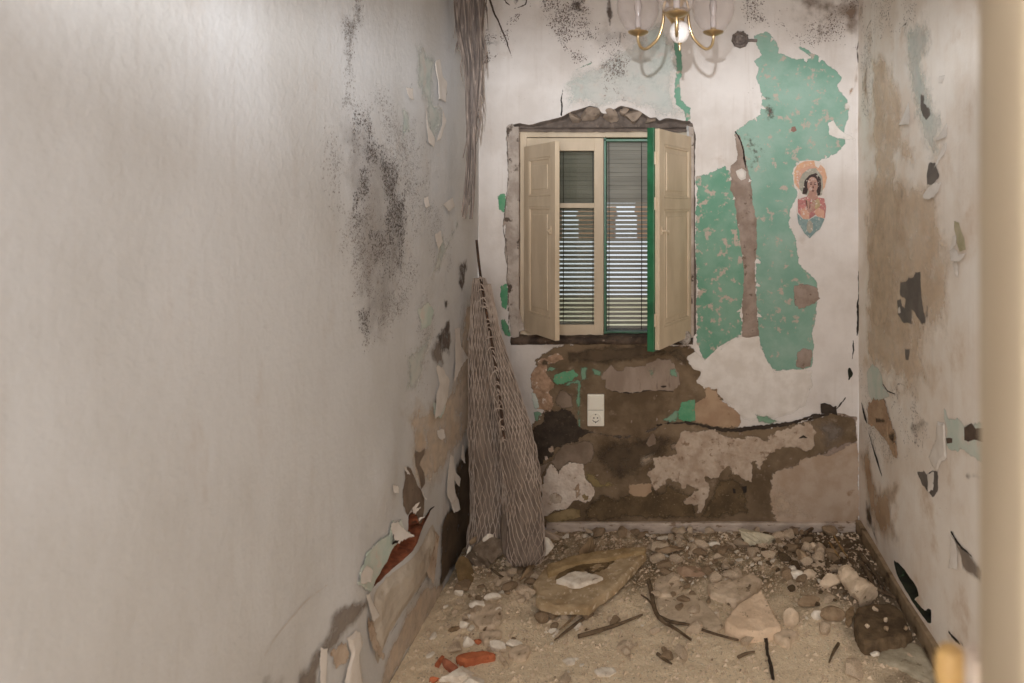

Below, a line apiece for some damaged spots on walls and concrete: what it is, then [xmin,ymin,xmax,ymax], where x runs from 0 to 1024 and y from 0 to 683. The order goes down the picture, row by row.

damp [483,0,630,101]
damp [320,0,467,352]
flaking render [539,436,608,528]
peeling [530,344,685,427]
peeling [498,28,856,371]
damp [531,0,944,531]
flaking render [629,364,899,522]
crack [657,271,882,476]
spalling [897,272,928,324]
peeling [917,410,980,497]
spalling [299,448,434,683]
spalling [894,561,931,623]